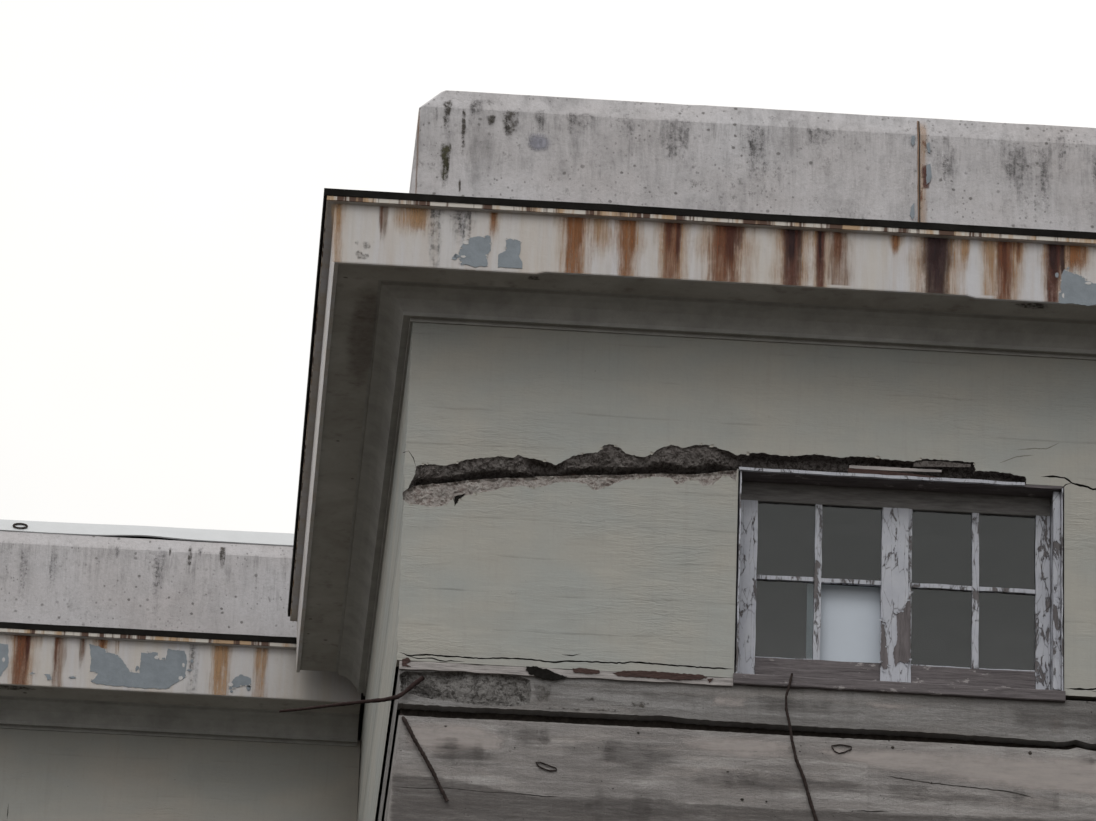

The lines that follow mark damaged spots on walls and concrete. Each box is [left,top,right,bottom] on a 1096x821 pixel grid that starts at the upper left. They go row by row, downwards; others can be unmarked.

damp [441,101,480,180]
damp [488,112,518,133]
damp [530,135,548,150]
rust [779,229,848,287]
rust [918,237,968,294]
rust [1043,244,1088,302]
peeling [1055,267,1096,306]
spalling [403,443,1026,507]
crack [1000,443,1096,492]
rust [13,635,33,685]
spalling [279,657,600,713]
peeling [878,591,913,672]